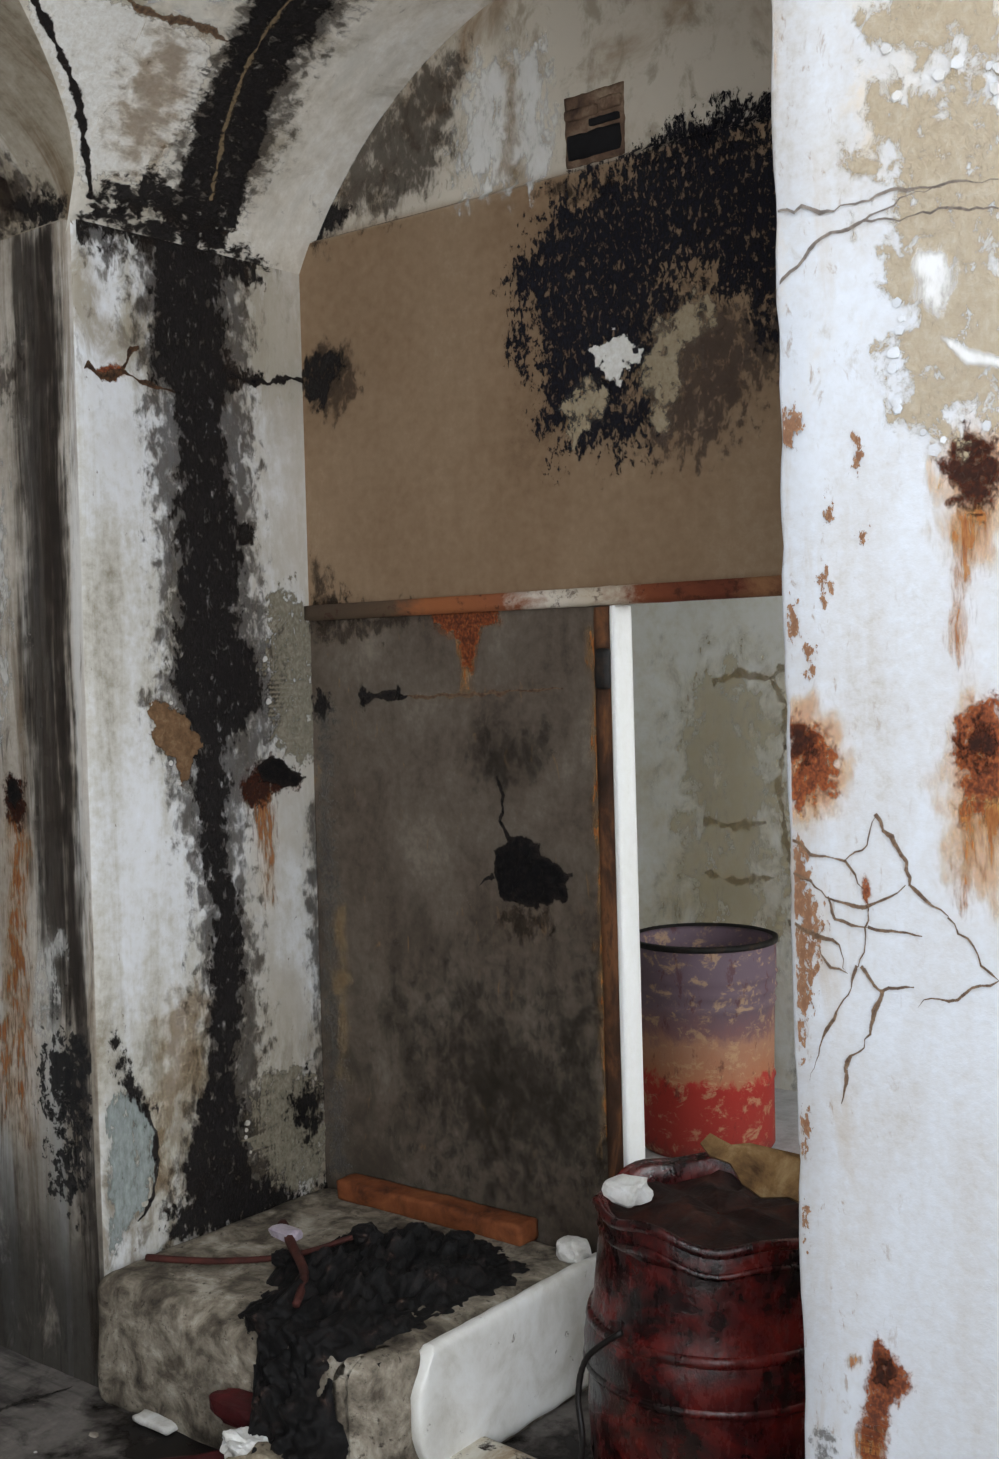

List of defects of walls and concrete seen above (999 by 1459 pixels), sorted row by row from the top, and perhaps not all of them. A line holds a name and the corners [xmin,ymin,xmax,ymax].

crack [30,0,93,193]
crack [778,178,999,284]
peeling [841,0,999,457]
corrosion [935,420,999,666]
spalling [147,700,204,786]
damp [671,657,791,937]
corrosion [790,708,843,818]
crack [703,664,999,1104]
corrosion [951,690,999,910]
damp [29,931,160,1231]
damp [387,983,607,1200]
corrosion [850,1338,913,1459]